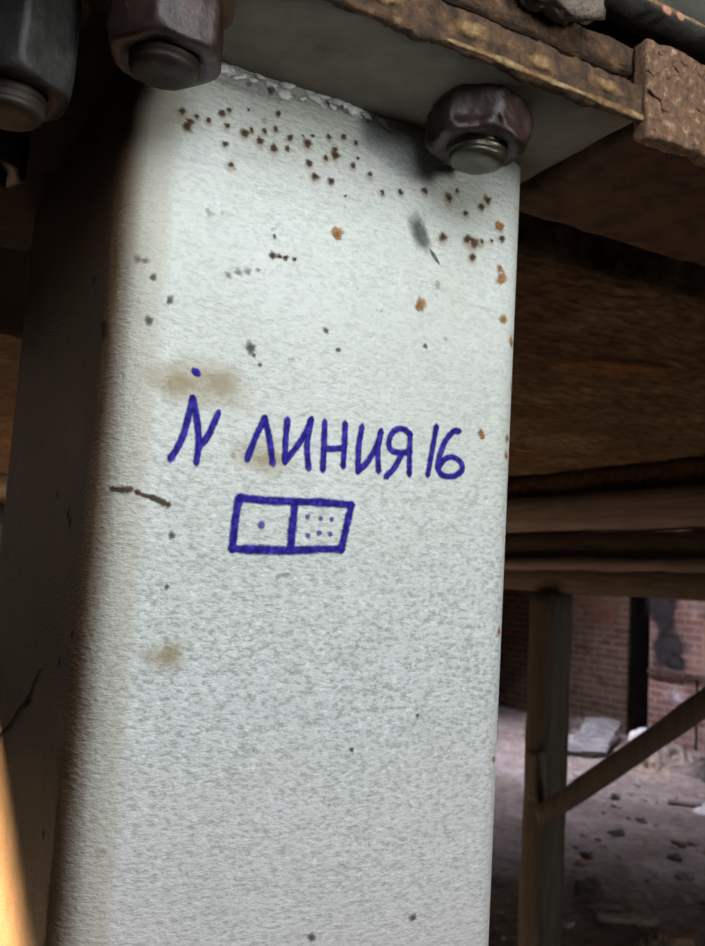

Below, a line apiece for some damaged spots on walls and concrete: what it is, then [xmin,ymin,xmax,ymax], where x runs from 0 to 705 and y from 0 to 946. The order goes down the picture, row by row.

corrosion [651,0,705,27]
corrosion [447,19,705,168]
corrosion [179,108,231,130]
corrosion [242,111,315,151]
corrosion [465,222,505,260]
crack [0,667,42,737]